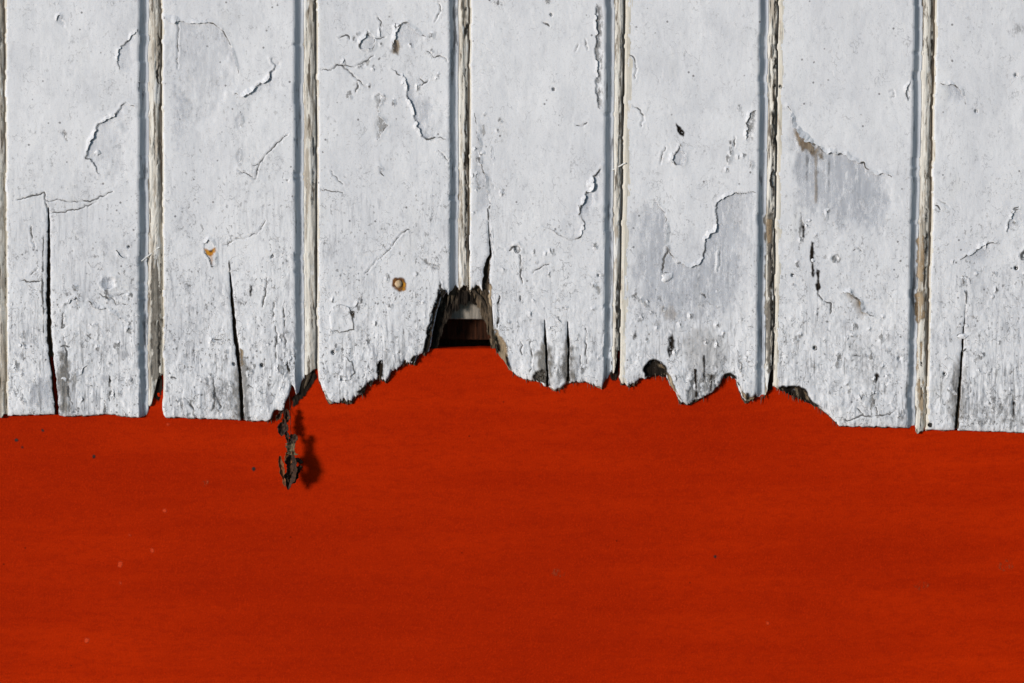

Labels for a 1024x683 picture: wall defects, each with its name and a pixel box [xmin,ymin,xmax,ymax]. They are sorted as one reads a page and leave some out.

water stain [796,131,822,158]
peeling [660,190,756,271]
crack [17,191,113,414]
crack [181,222,265,419]
rust [392,278,406,292]